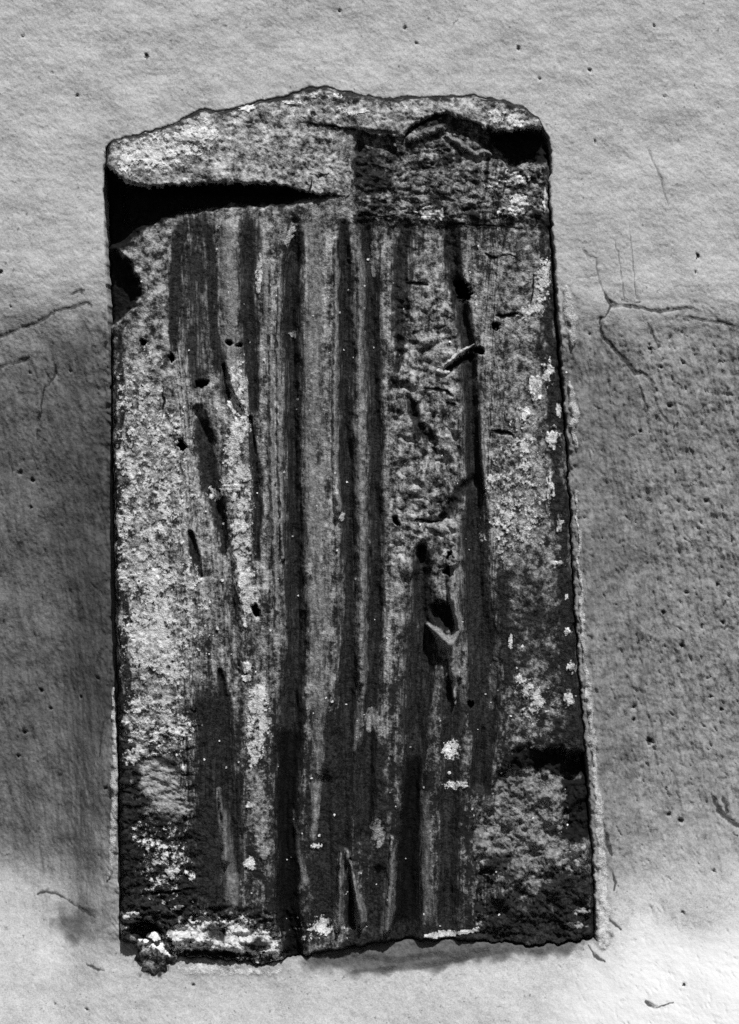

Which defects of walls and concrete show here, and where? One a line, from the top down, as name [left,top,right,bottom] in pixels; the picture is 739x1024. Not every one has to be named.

crack [0,289,93,337]
leakage [111,332,245,943]
leakage [168,209,263,561]
spalling [107,169,335,325]
leakage [273,138,594,974]
crack [589,291,739,428]